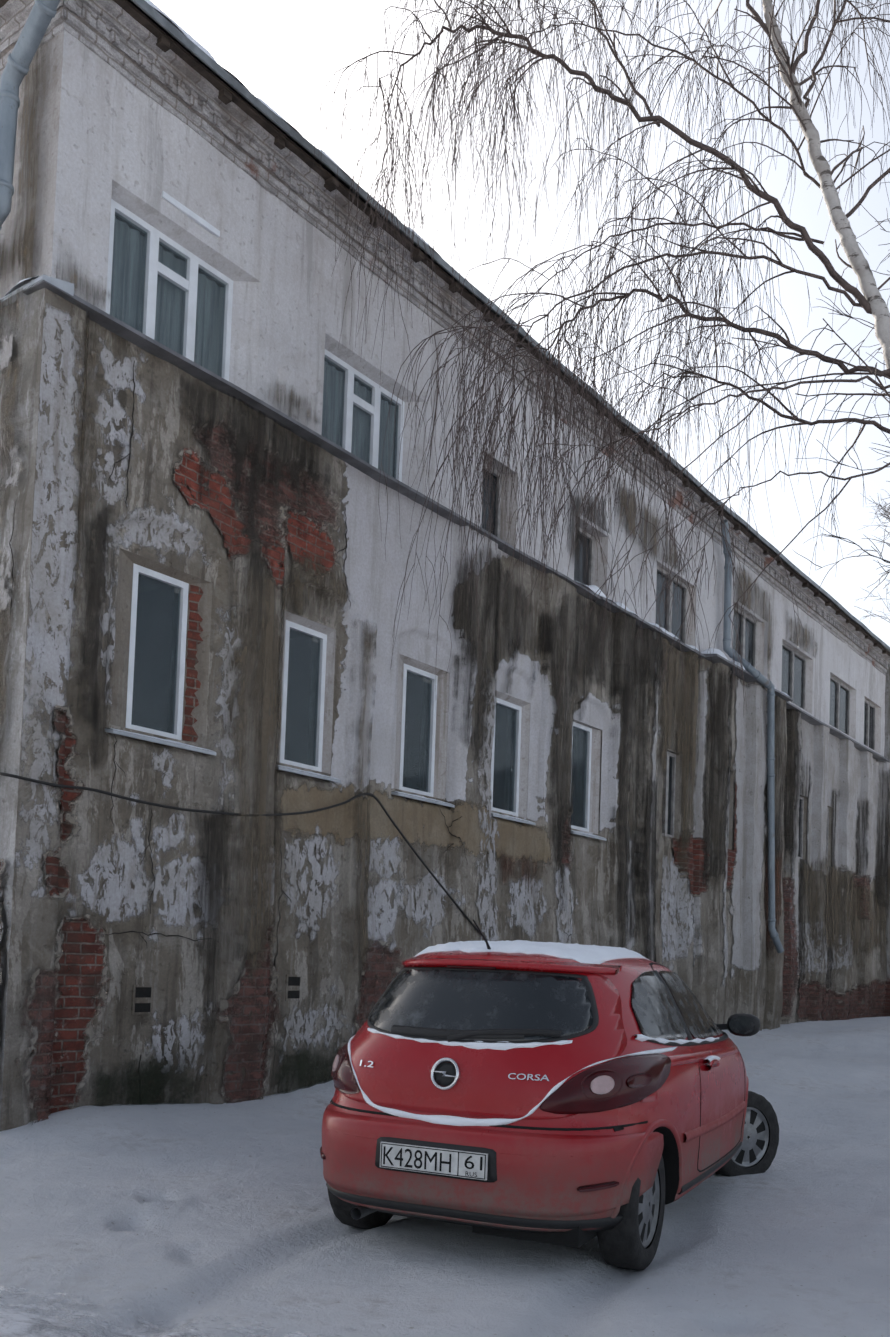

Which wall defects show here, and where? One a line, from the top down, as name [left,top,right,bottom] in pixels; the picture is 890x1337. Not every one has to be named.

damp [77,320,108,764]
damp [180,377,349,982]
peeling [0,304,578,1122]
damp [453,549,733,963]
peeling [569,692,621,838]
peeling [626,662,767,985]
damp [737,569,773,680]
damp [764,698,889,996]
peeling [781,712,890,1023]
damp [94,1061,195,1107]
damp [278,1049,333,1094]